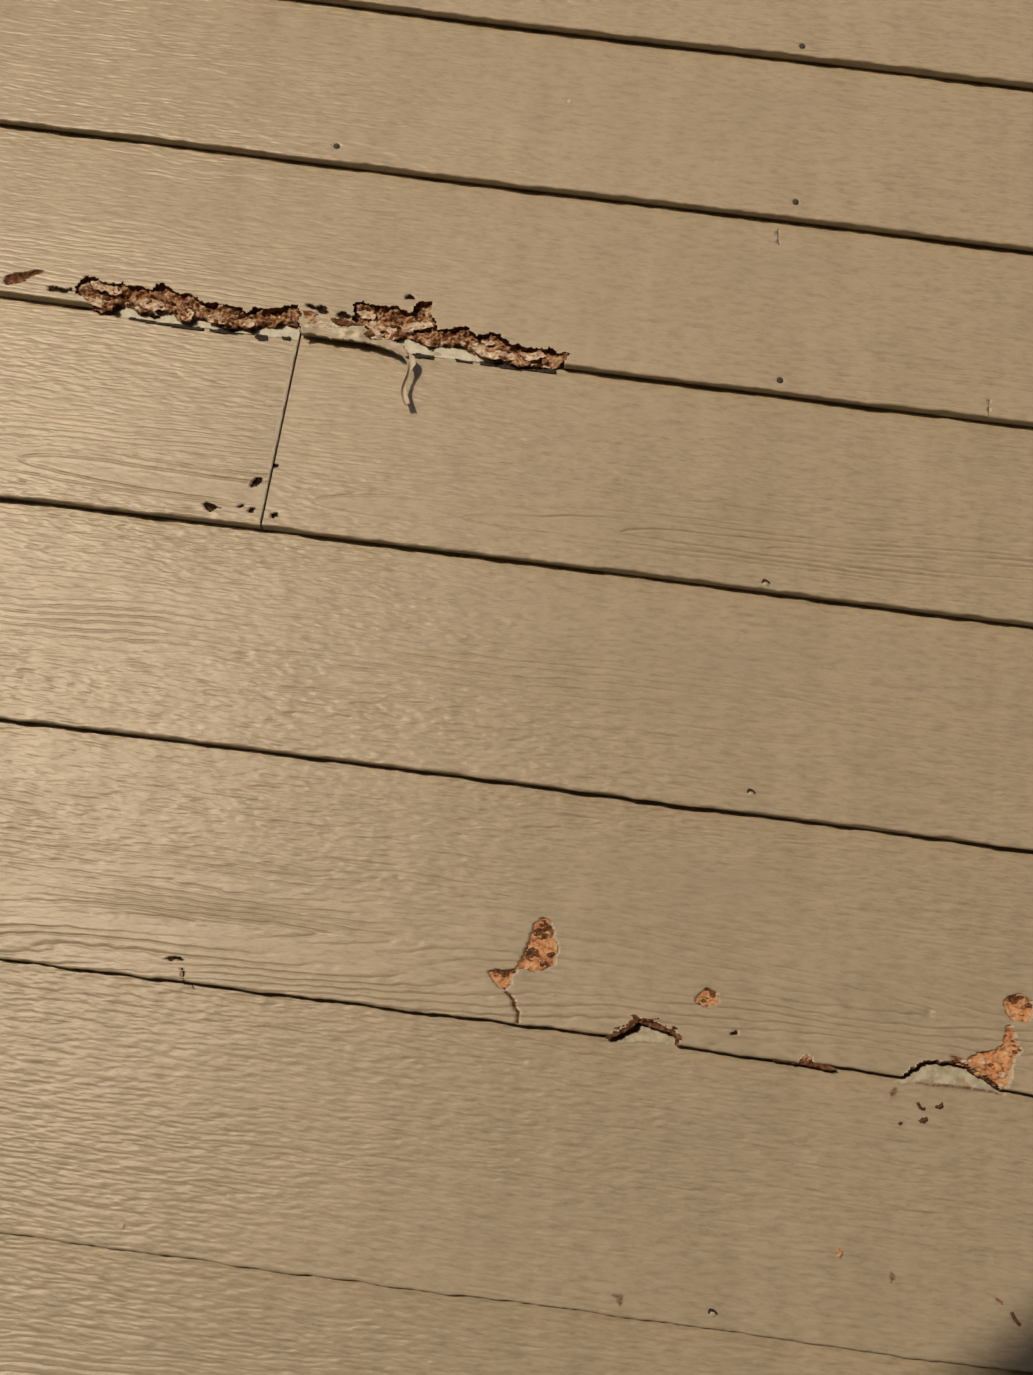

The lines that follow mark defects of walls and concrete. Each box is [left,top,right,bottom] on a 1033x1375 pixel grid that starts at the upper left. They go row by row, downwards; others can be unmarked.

spalling [4,270,122,309]
peeling [139,299,256,328]
peeling [301,294,434,406]
peeling [469,340,546,362]
peeling [489,918,557,988]
peeling [695,988,718,1007]
spalling [605,1014,682,1046]
spalling [891,994,1033,1098]
peeling [898,1102,944,1125]